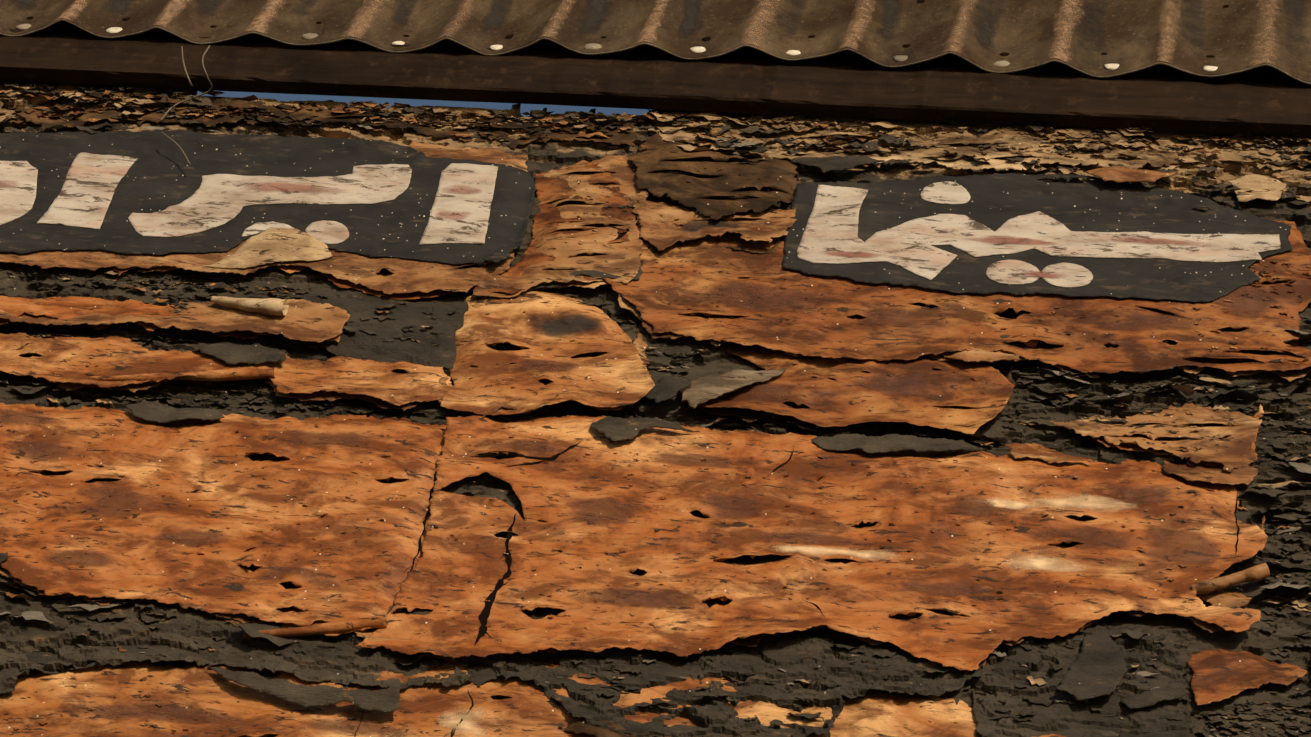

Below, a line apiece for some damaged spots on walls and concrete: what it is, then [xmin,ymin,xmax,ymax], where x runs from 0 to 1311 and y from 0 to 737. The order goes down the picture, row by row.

peeling [0,81,1311,209]
peeling [0,267,470,369]
spalling [535,286,641,325]
crack [474,513,517,645]